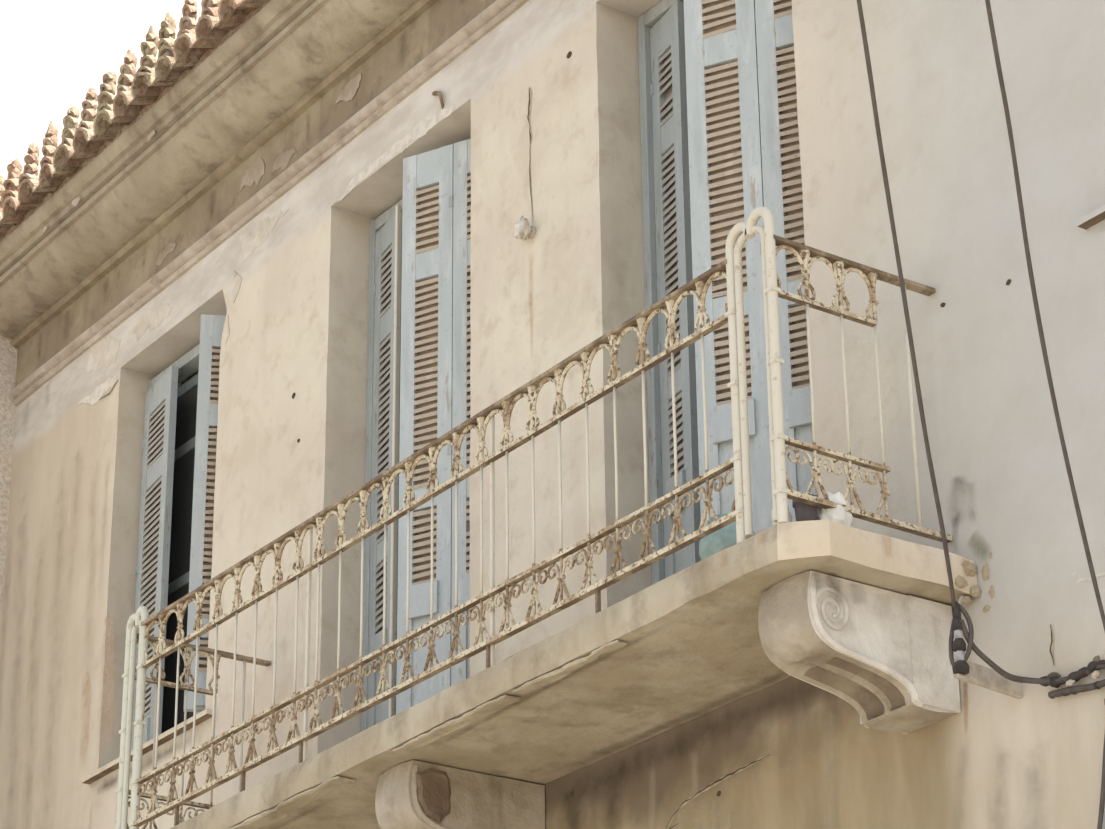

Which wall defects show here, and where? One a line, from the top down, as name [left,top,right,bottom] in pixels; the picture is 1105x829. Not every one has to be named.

peeling [335,73,362,104]
spalling [955,552,995,612]
crack [666,754,772,829]